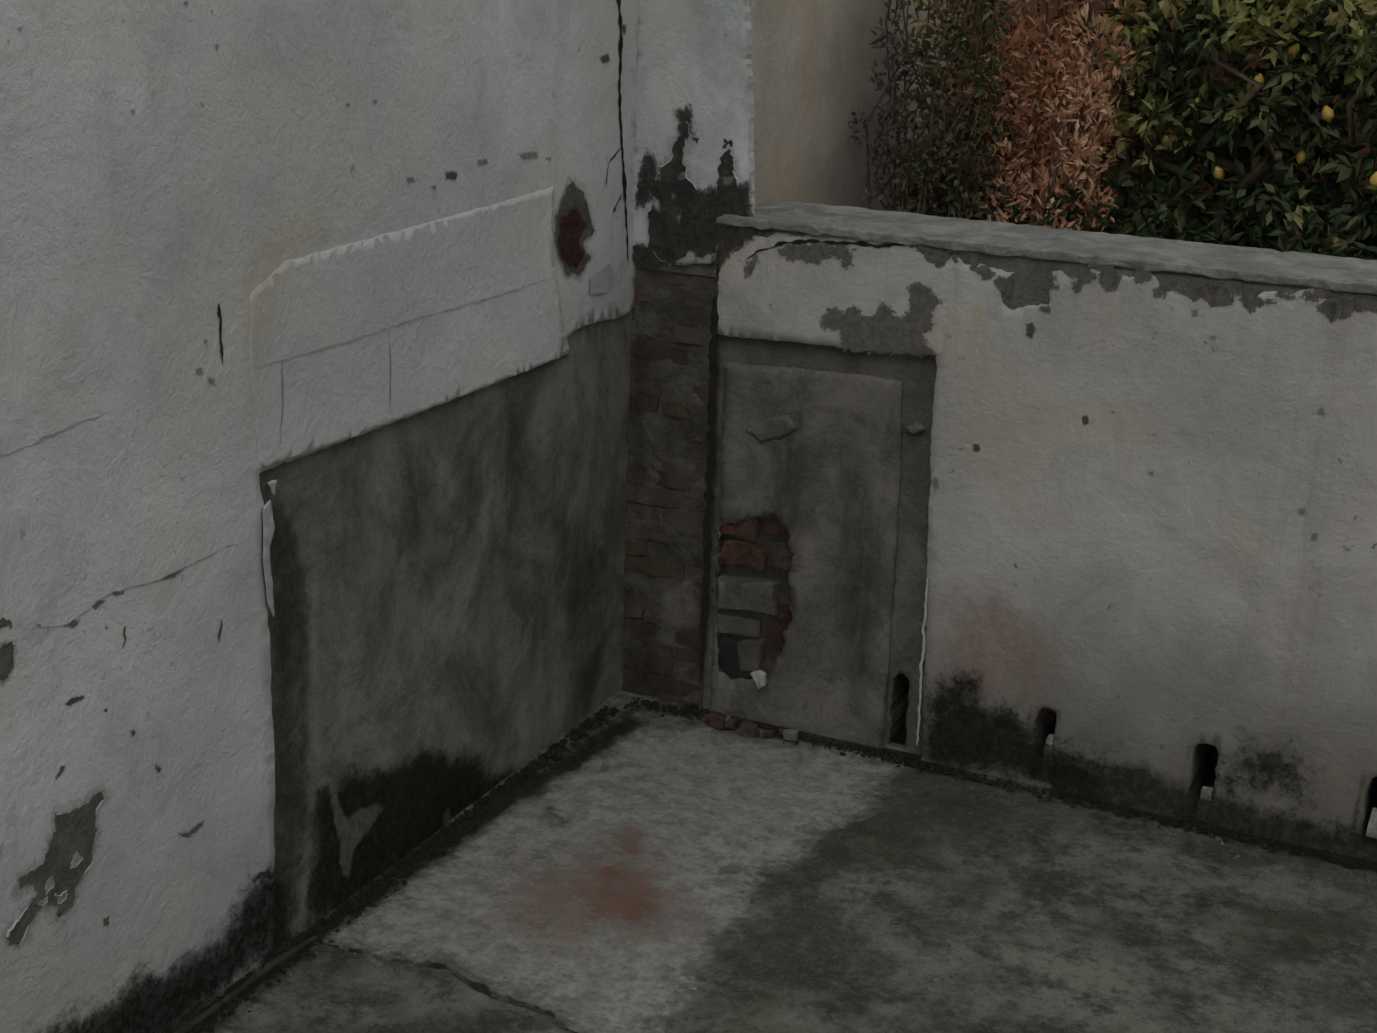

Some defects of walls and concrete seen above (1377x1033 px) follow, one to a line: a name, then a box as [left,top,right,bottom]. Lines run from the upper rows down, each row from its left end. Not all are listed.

spalling [553,180,616,295]
crack [599,0,628,259]
spalling [632,104,759,272]
peeling [816,281,942,358]
peeling [1026,264,1377,339]
crack [0,411,109,457]
crack [30,541,246,629]
spalling [712,517,794,680]
leakage [270,507,309,919]
leakage [1040,742,1377,862]
peeling [6,792,105,946]
crack [317,942,578,1033]